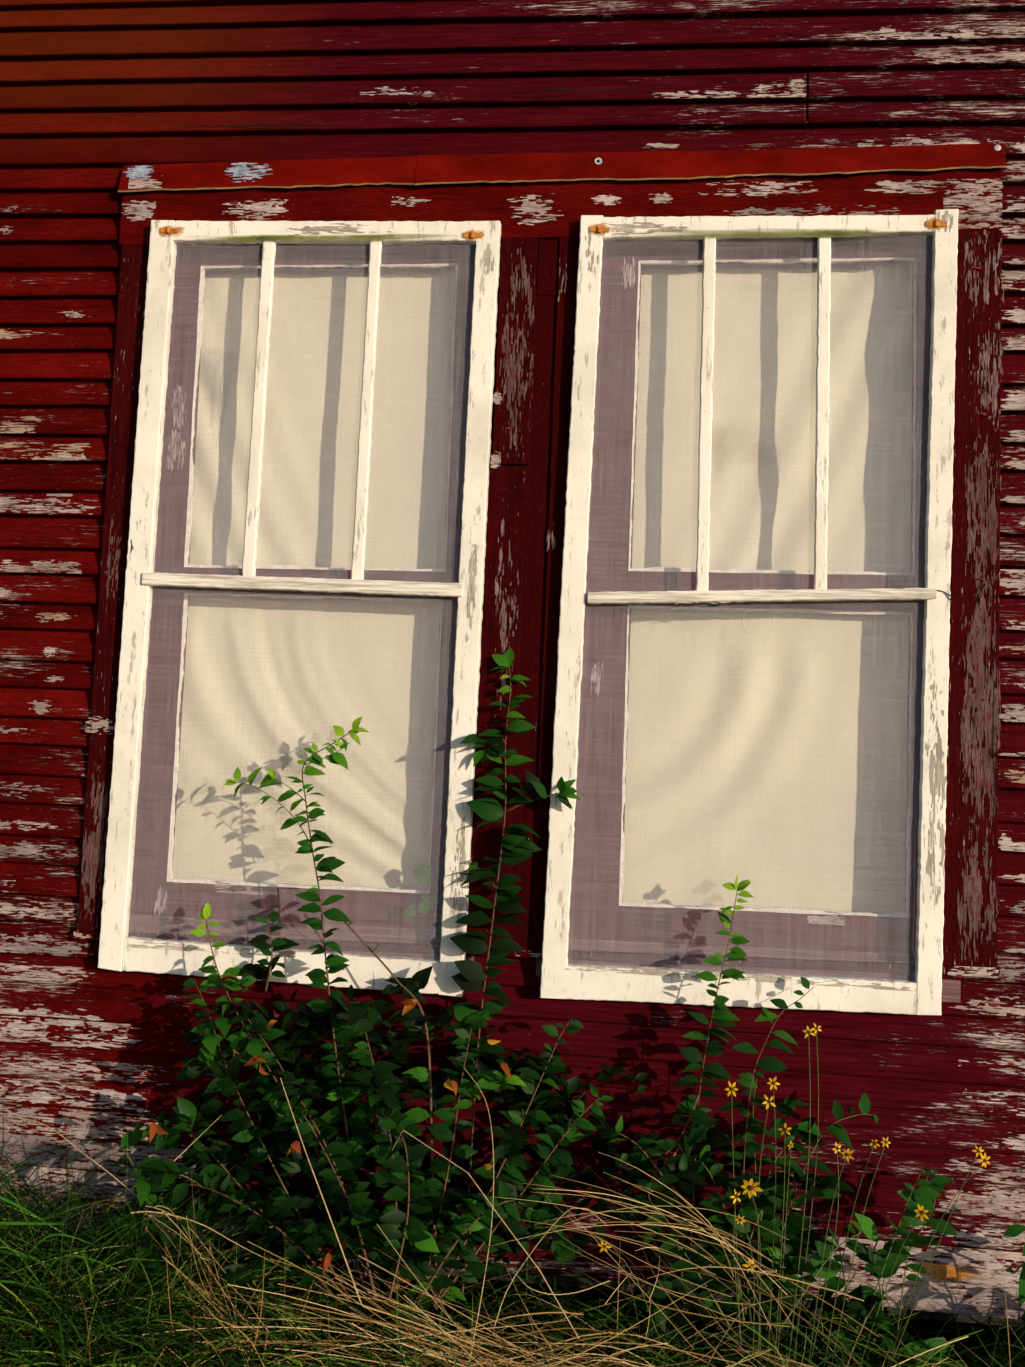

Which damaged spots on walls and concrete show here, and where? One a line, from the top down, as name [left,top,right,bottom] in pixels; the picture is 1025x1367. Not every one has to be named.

peeling [857,21,1025,64]
peeling [652,79,806,114]
peeling [121,165,162,221]
peeling [225,162,272,182]
peeling [222,199,289,220]
peeling [0,416,92,460]
peeling [0,494,98,515]
peeling [0,560,81,619]
peeling [466,513,519,718]
peeling [700,134,1025,1040]
peeling [958,1058,1025,1116]
peeling [806,1132,1025,1319]